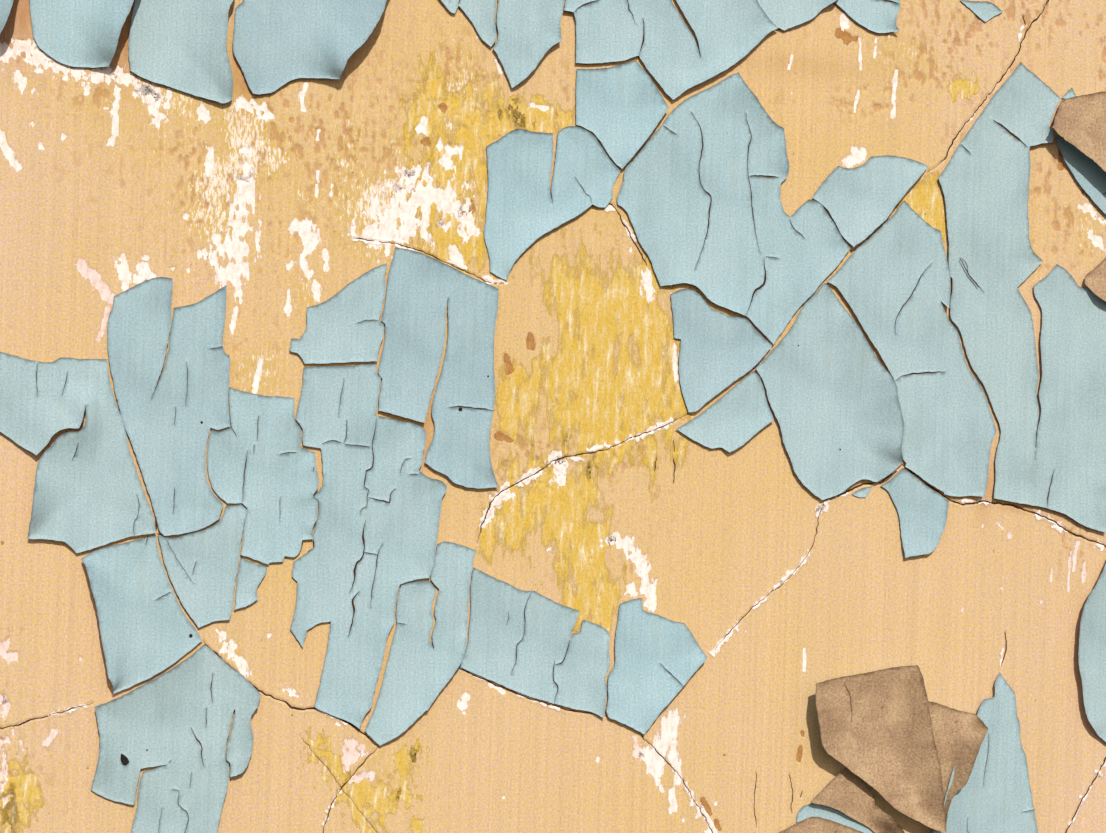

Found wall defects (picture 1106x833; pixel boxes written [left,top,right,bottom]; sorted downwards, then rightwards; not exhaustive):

peeling [0,0,387,147]
peeling [441,0,1106,558]
peeling [0,136,707,833]
crack [477,414,687,542]
crack [709,464,1106,657]
crack [458,591,595,714]
peeling [1067,540,1106,742]
leakage [0,755,50,833]
crack [158,641,380,833]
crack [637,732,718,833]
peeling [796,803,875,833]
peeling [932,673,1038,833]